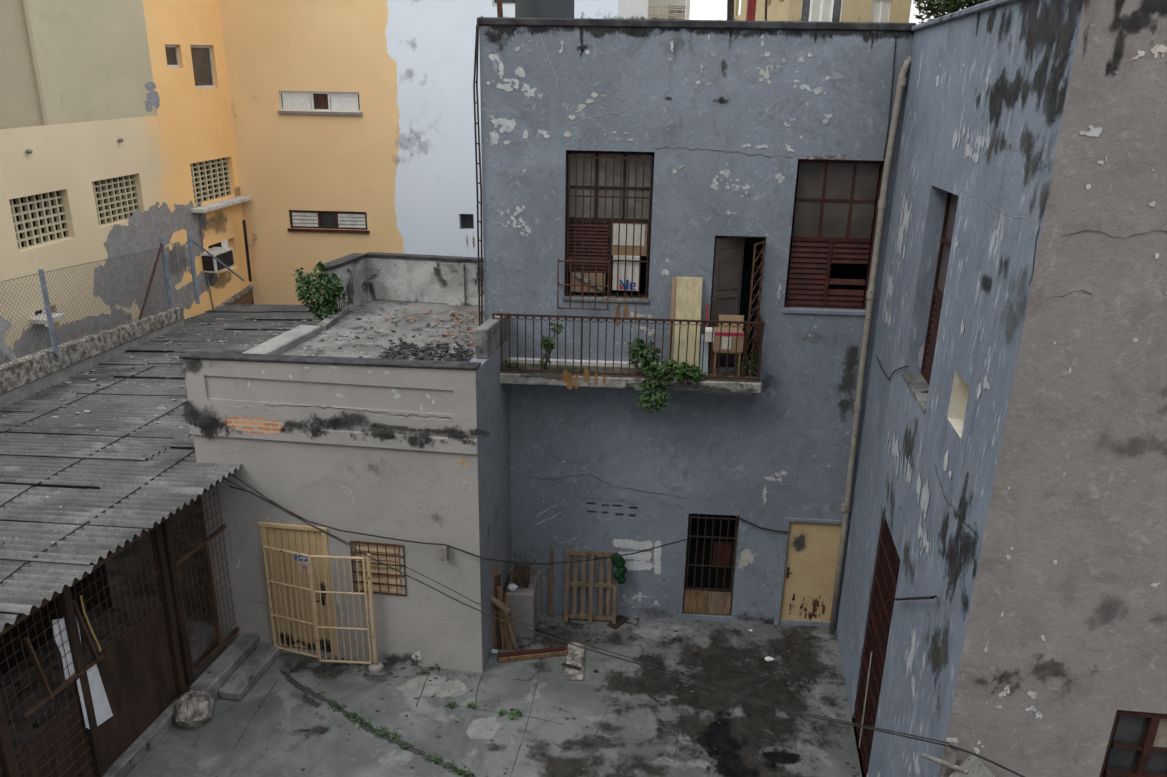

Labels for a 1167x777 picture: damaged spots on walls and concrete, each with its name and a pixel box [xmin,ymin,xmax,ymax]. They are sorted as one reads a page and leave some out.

damp [1106,0,1167,75]
peeling [486,54,543,98]
peeling [486,115,549,145]
peeling [563,93,606,137]
damp [976,0,1090,221]
crack [1029,226,1167,299]
flaking render [207,417,284,438]
damp [281,411,490,448]
damp [938,472,977,612]
damp [516,613,844,777]
damp [926,622,948,708]